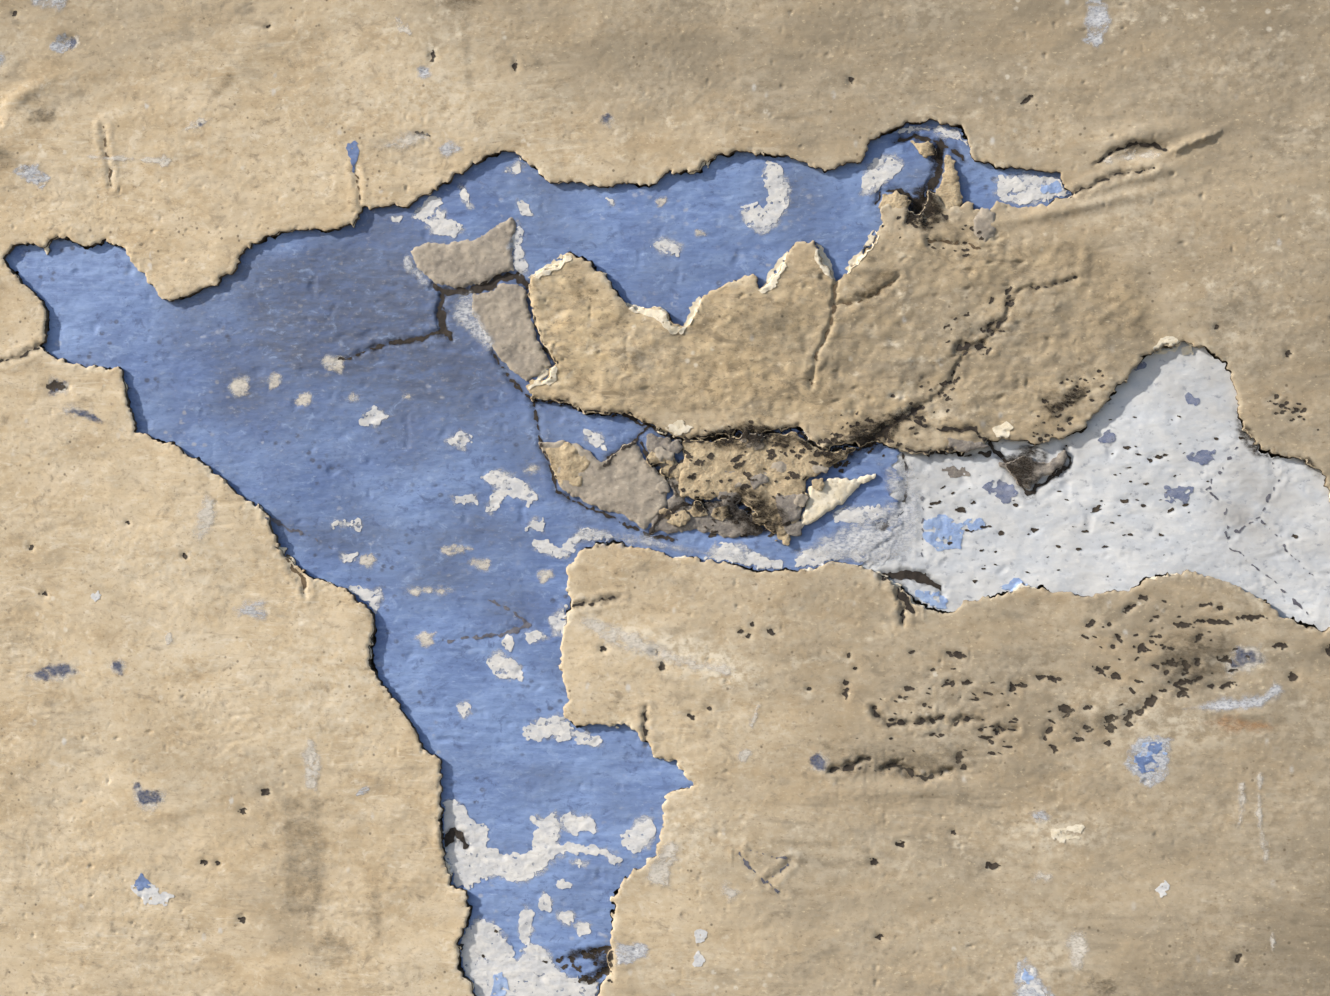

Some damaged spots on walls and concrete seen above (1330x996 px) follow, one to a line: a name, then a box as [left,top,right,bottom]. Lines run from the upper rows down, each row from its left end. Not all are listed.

crack [338,272,558,364]
flaking render [46,380,69,393]
flaking render [893,374,960,435]
flaking render [1267,394,1319,431]
crack [493,276,1077,623]
peeling [30,663,77,680]
flaking render [872,651,1062,755]
flaking render [1043,704,1092,753]
flaking render [1072,600,1268,746]
water stain [1201,685,1281,710]
peeling [1124,736,1171,787]
peeling [131,873,175,906]